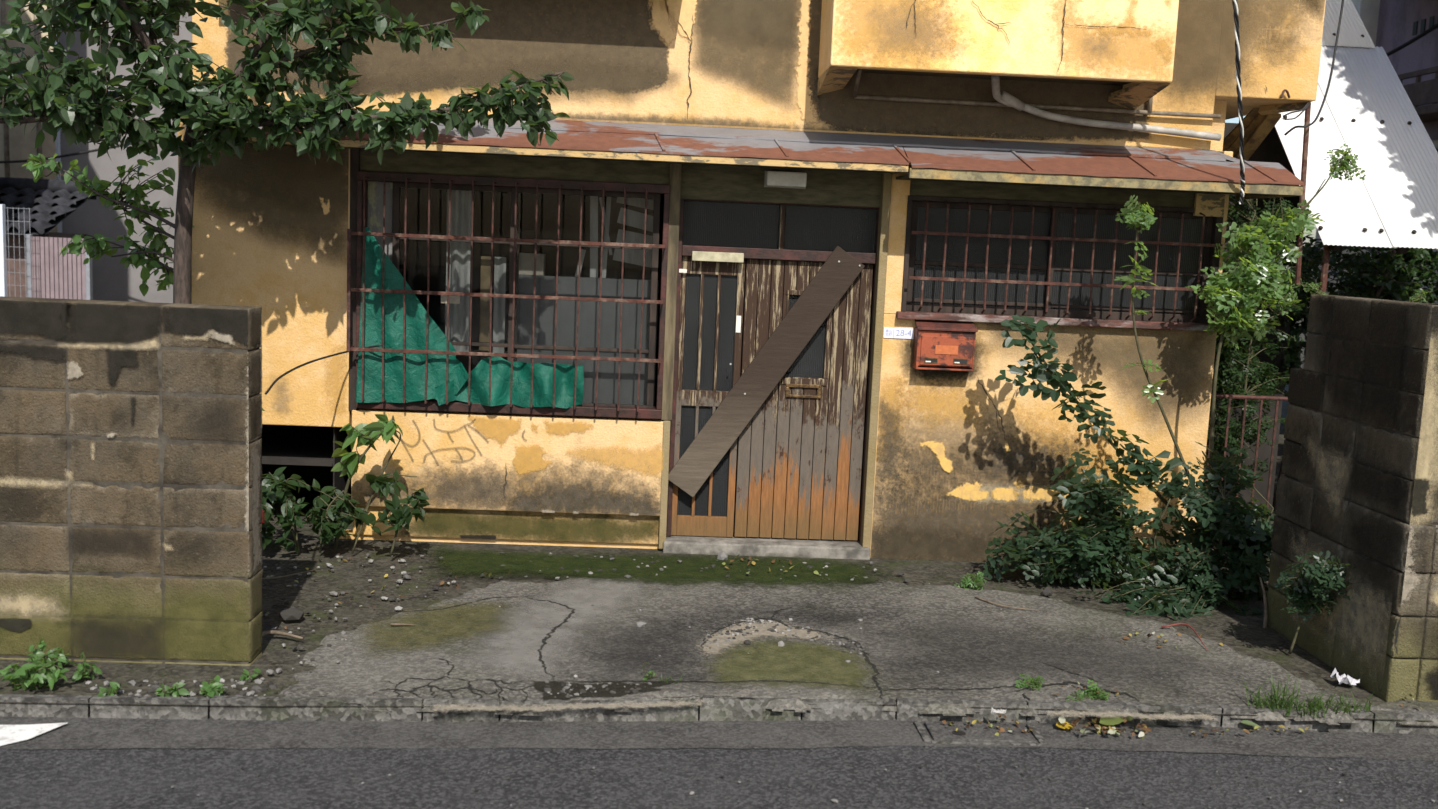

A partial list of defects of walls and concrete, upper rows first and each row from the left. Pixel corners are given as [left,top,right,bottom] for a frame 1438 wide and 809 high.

damp [224,0,669,97]
crack [678,16,694,119]
damp [559,0,1149,142]
crack [972,1,1010,43]
damp [356,469,660,515]
peeling [468,416,592,474]
peeling [567,448,664,474]
peeling [920,441,1085,502]
damp [0,596,59,616]
crack [369,595,1139,704]
damp [1427,671,1438,700]